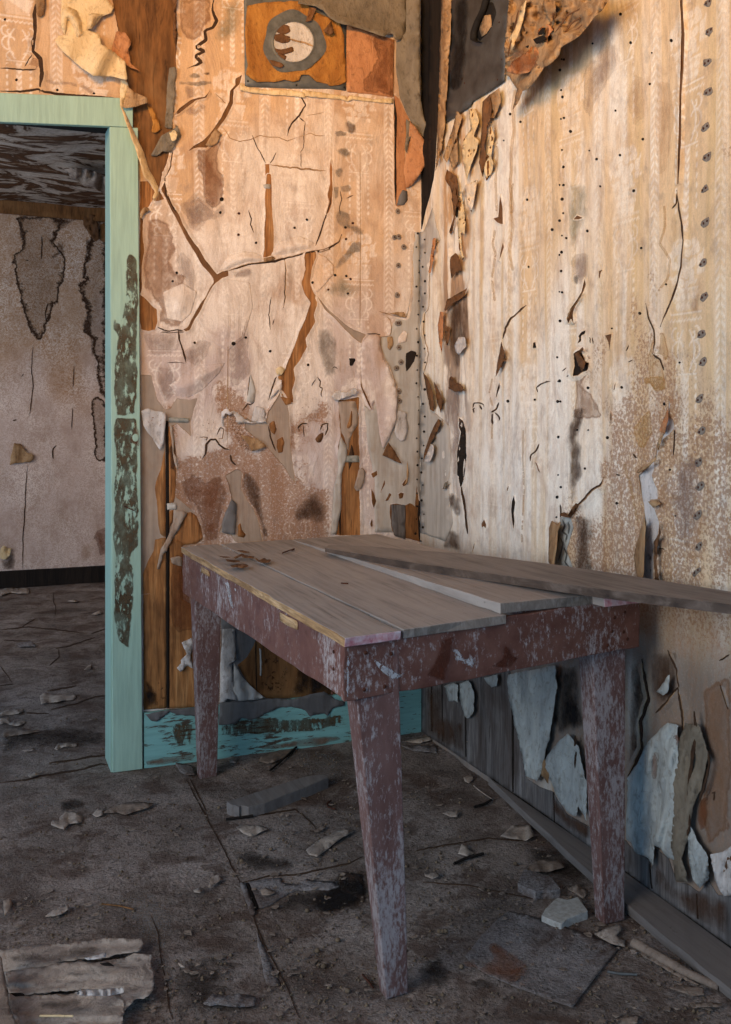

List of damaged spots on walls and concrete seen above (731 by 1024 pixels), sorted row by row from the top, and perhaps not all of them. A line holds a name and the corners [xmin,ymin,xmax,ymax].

crack [187,0,221,70]
crack [224,90,323,167]
peeling [445,109,495,278]
crack [645,0,689,370]
crack [158,117,353,466]
peeling [93,255,166,647]
peeling [361,334,402,464]
peeling [423,373,443,462]
peeling [548,521,561,564]
crack [187,780,363,884]
peeling [518,860,588,929]
crack [253,915,299,1017]